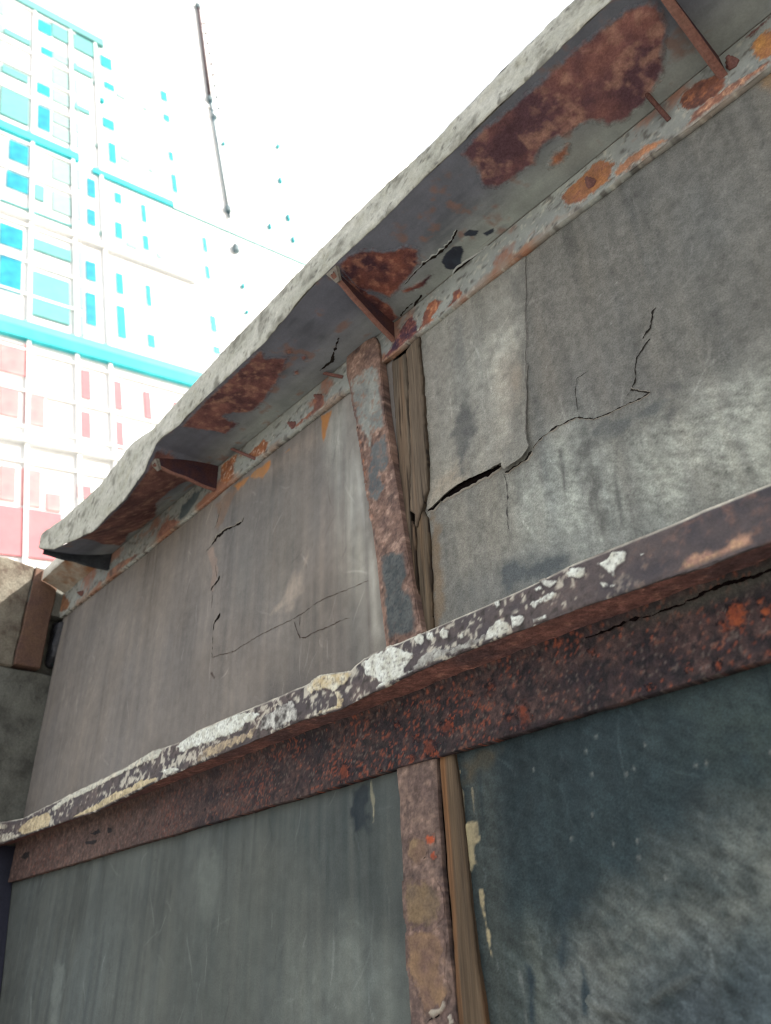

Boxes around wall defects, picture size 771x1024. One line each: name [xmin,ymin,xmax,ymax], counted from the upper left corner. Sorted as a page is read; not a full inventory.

rust [460,1,670,190]
rust [337,242,465,362]
crack [400,230,489,316]
rust [178,348,310,435]
crack [427,273,656,529]
crack [206,511,367,657]
crack [585,569,771,639]
peeling [176,699,298,763]
peeling [0,748,179,845]
peeling [462,787,482,873]
rust [402,877,451,1017]
peeling [474,886,494,959]